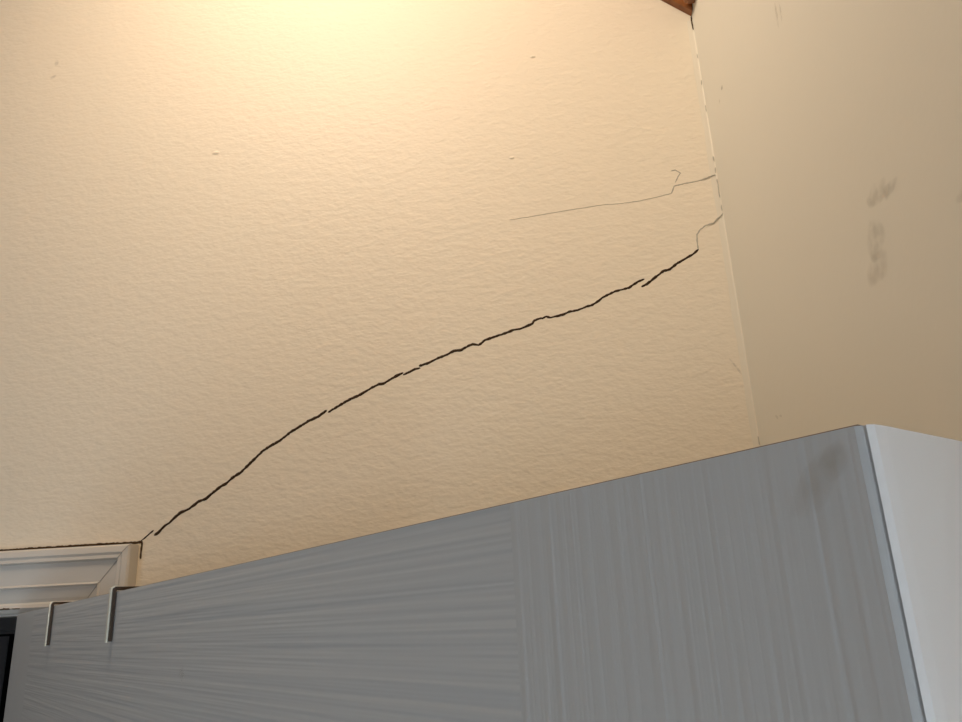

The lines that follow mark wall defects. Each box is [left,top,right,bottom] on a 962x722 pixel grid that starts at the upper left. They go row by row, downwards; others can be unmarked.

crack [141,156,723,541]